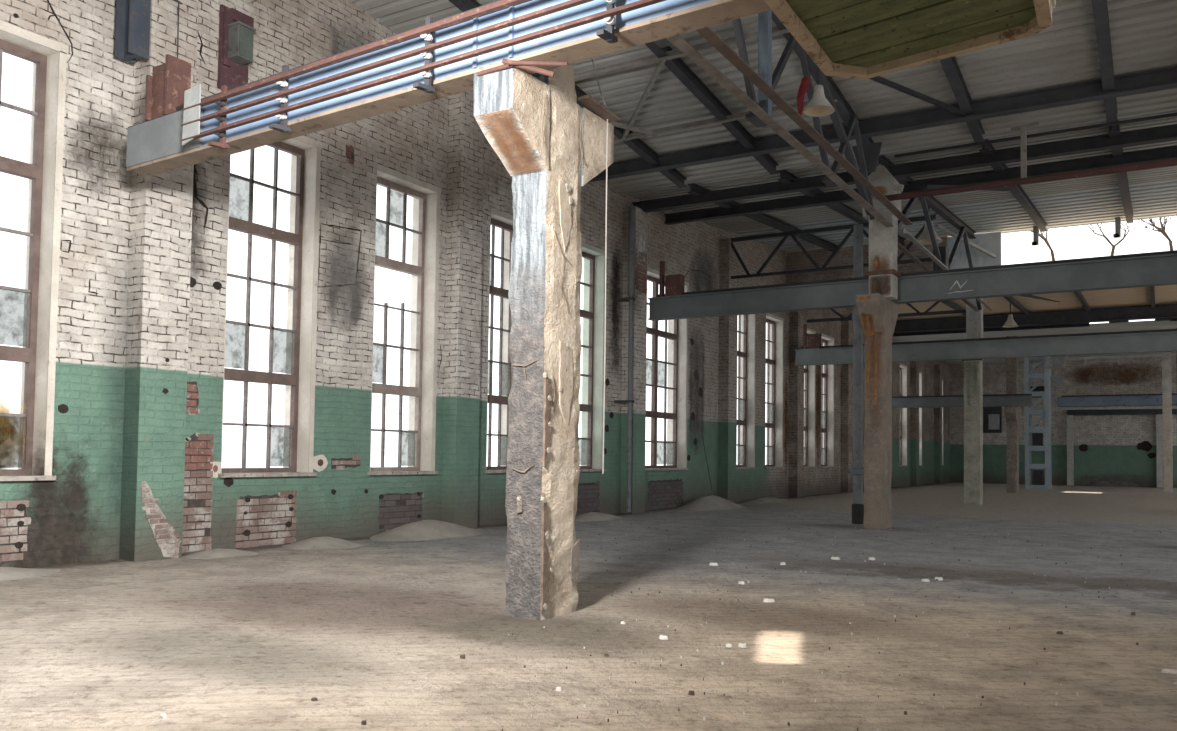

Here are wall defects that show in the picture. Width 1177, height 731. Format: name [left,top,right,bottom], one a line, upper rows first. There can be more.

crack [47,0,73,63]
leakage [329,244,362,318]
flaking render [186,381,200,415]
flaking render [0,500,31,566]
leakage [34,458,53,502]
flaking render [141,432,297,559]
flaking render [364,489,423,531]
spalling [540,493,553,610]